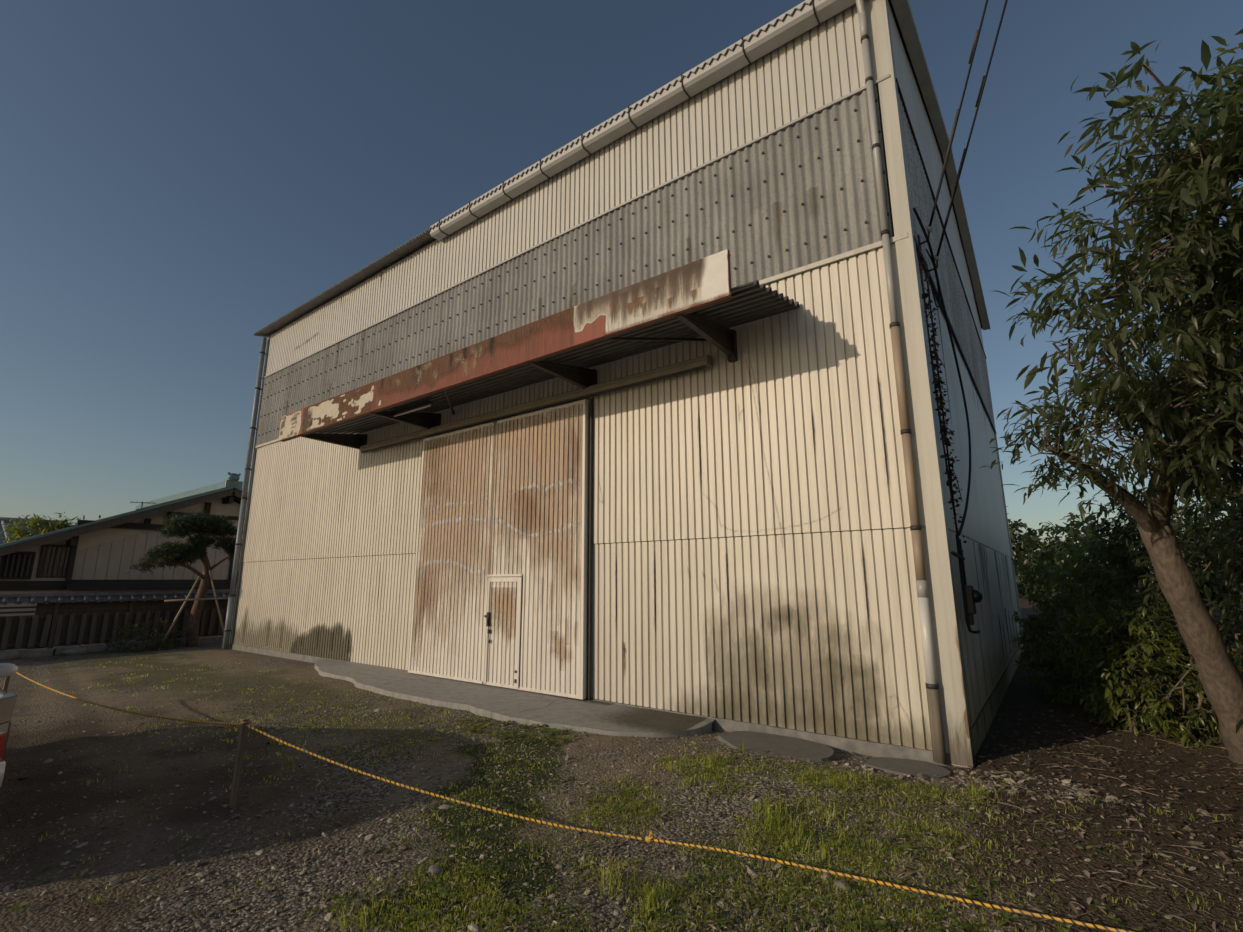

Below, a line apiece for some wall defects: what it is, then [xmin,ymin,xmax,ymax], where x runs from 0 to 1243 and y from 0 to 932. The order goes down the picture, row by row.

peeling [574,249,731,336]
peeling [278,385,381,441]
corrosion [303,307,574,433]